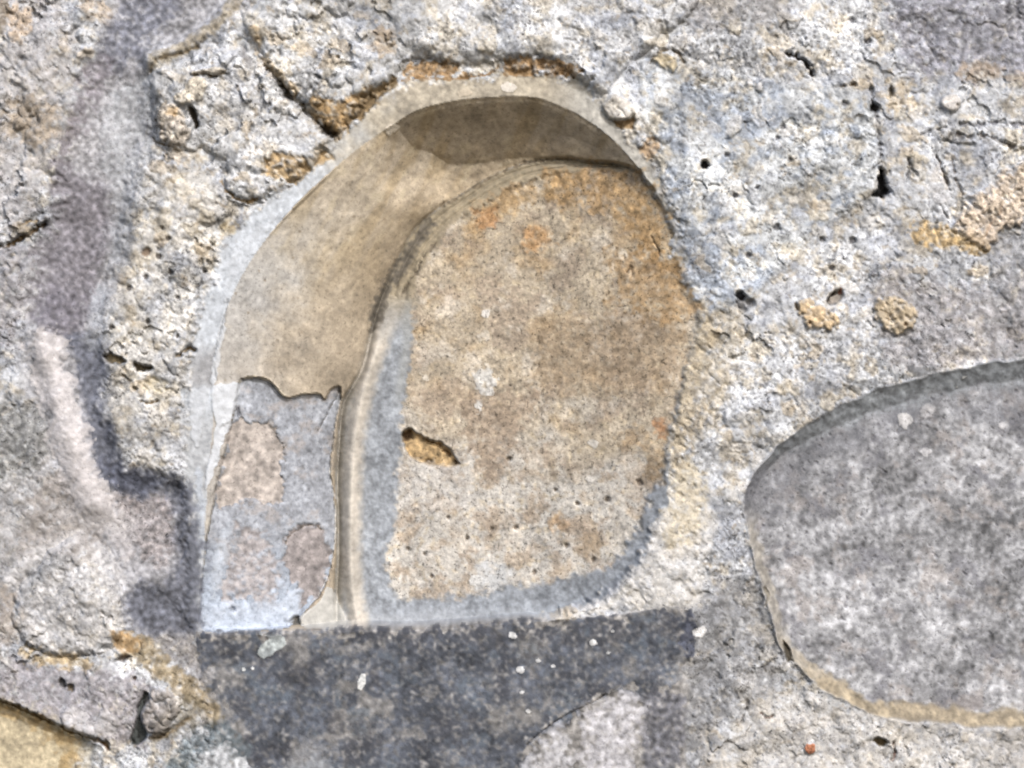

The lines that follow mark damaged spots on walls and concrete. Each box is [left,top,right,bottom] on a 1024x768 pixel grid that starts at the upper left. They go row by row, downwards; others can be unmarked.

spalling [141,247,173,274]
spalling [188,210,347,633]
spalling [402,429,459,464]